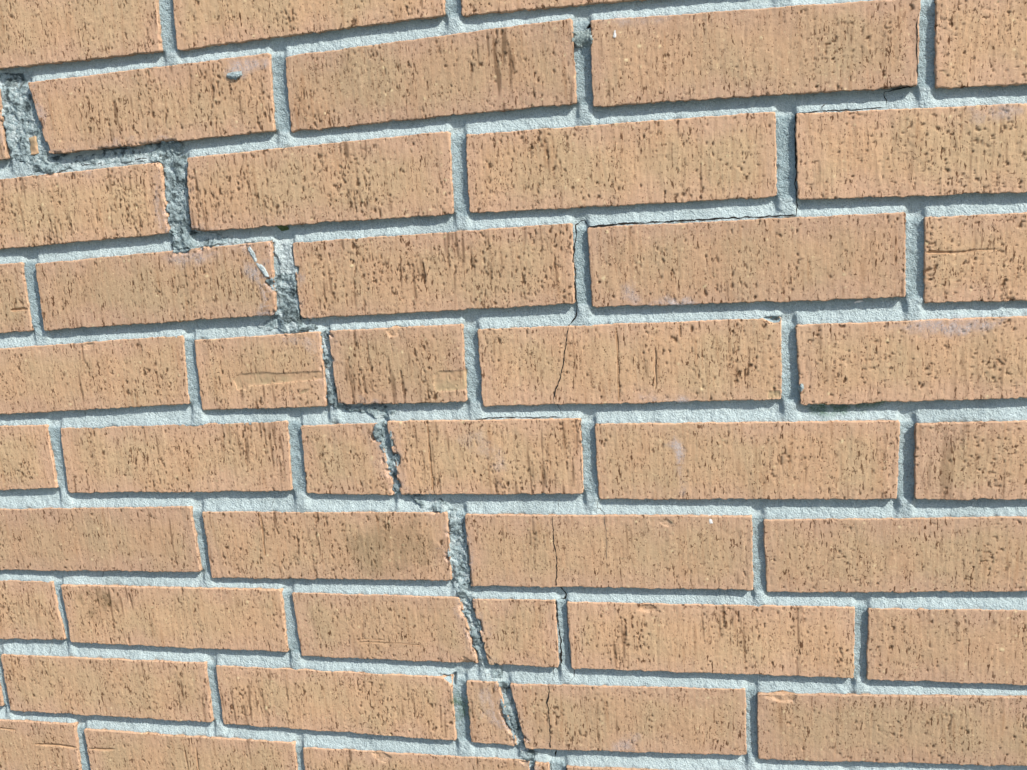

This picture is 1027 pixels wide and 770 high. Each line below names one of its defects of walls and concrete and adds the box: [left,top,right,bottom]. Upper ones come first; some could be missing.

crack [0,70,575,770]
crack [482,0,936,561]